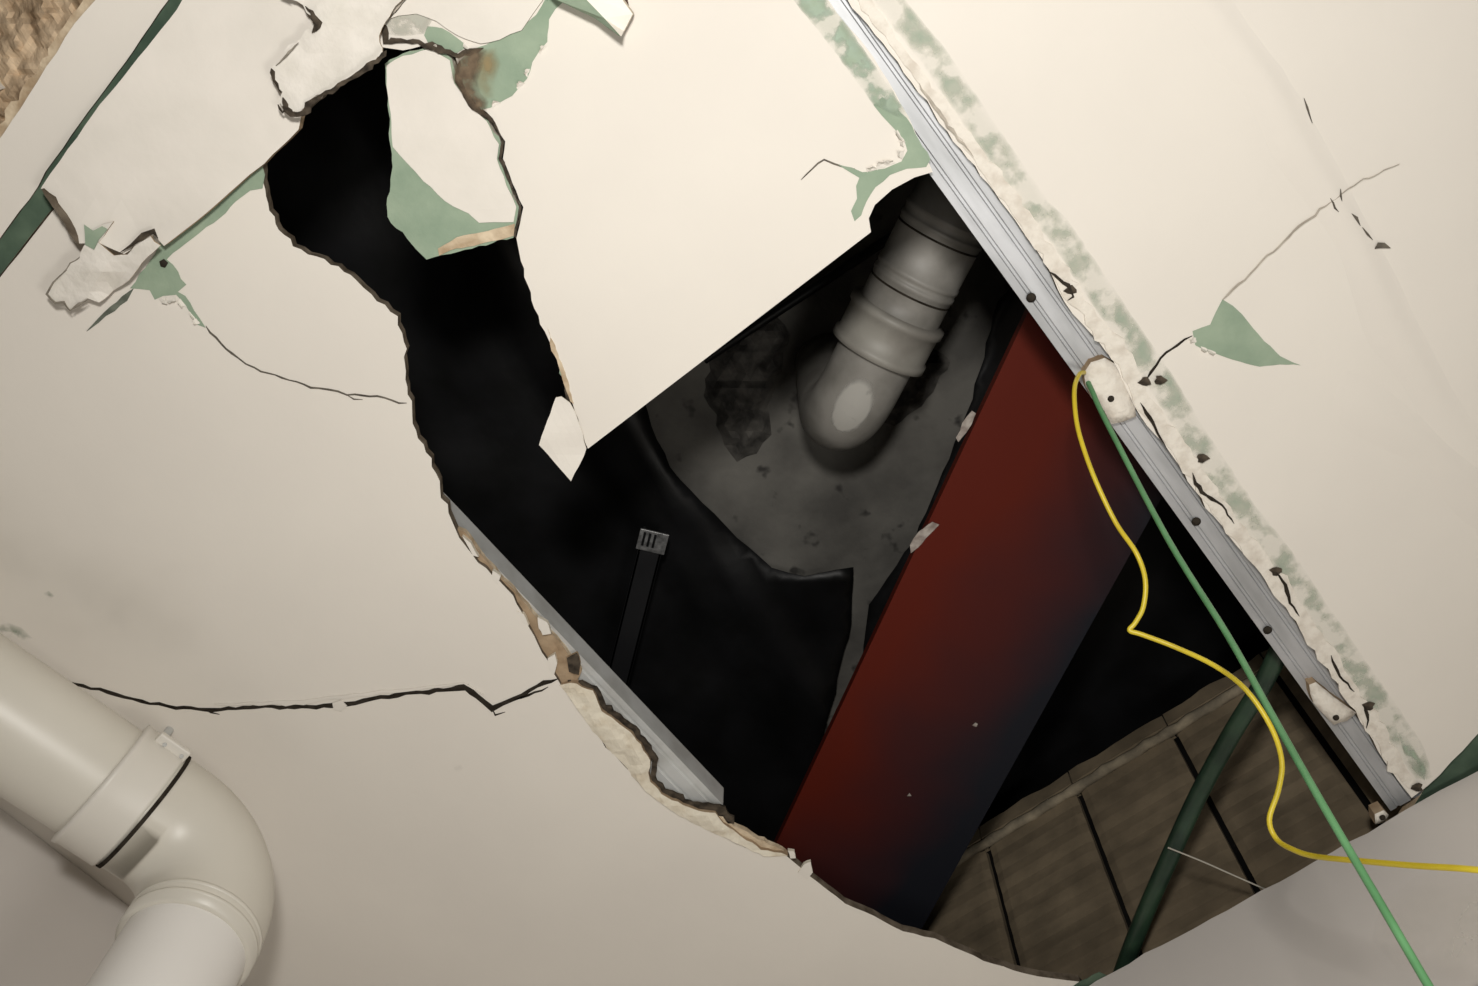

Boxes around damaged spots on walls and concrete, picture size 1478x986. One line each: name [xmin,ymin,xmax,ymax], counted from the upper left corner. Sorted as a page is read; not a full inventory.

peeling [389,0,562,110]
peeling [799,0,930,221]
crack [801,159,855,180]
peeling [131,166,265,328]
crack [1223,164,1399,299]
crack [206,326,405,404]
spalling [884,349,950,426]
peeling [1064,255,1182,407]
peeling [1190,299,1299,367]
peeling [910,522,939,553]
crack [72,679,558,716]
spalling [458,526,813,879]